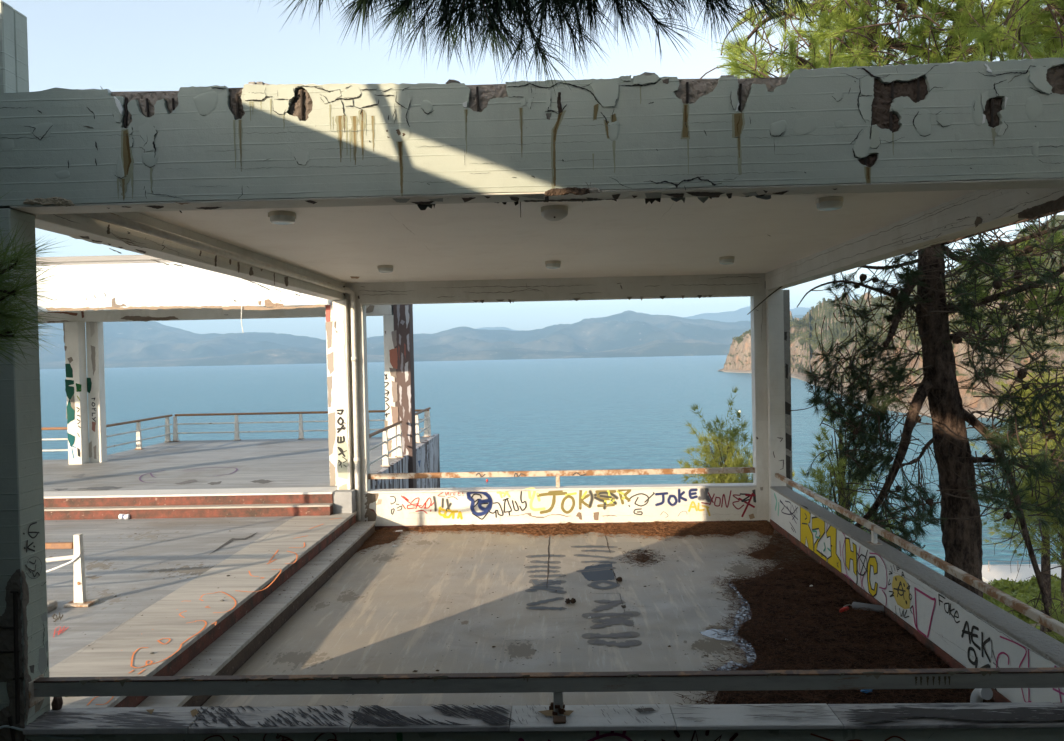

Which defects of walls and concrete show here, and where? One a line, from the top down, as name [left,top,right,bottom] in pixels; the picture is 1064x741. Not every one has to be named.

crack [2,107,53,140]
corrosion [117,129,134,200]
spalling [111,91,179,147]
spalling [228,88,313,121]
corrosion [329,104,375,165]
spalling [463,84,508,112]
corrosion [551,110,566,189]
crack [84,65,1064,199]
spalling [590,74,719,107]
corrosion [732,113,745,175]
spalling [854,68,928,167]
crack [344,286,407,478]